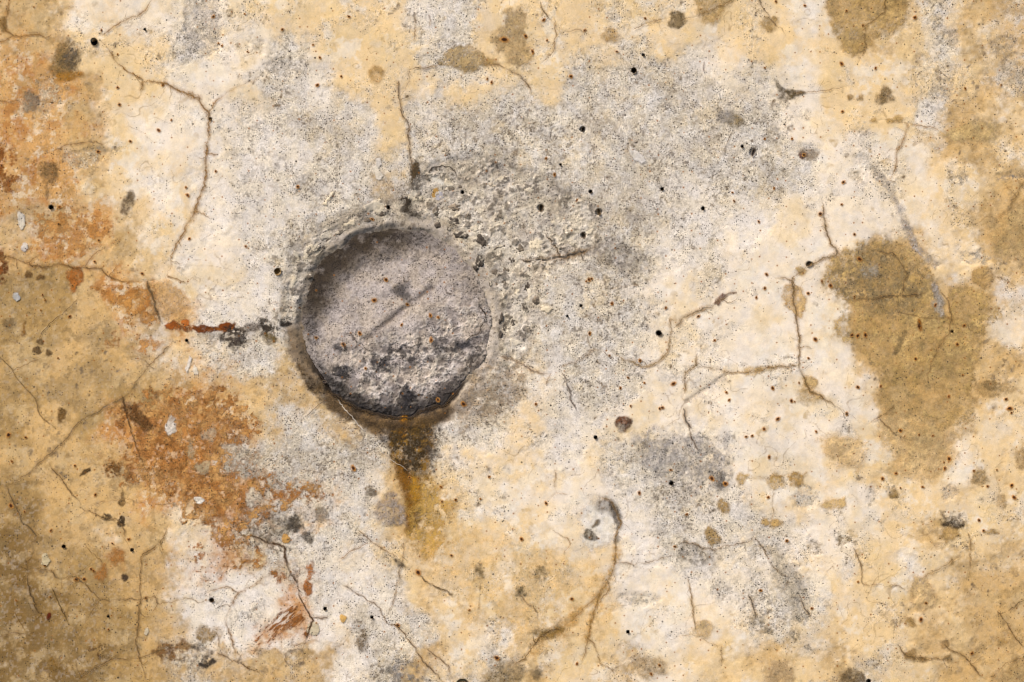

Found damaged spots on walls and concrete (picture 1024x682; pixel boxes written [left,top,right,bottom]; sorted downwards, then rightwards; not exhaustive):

damp [826,0,909,56]
crack [0,0,222,319]
rust [29,203,235,353]
spalling [281,153,599,369]
crack [683,205,844,449]
damp [822,238,1014,481]
rust [103,384,324,583]
rust [388,416,464,559]
crack [517,498,811,668]